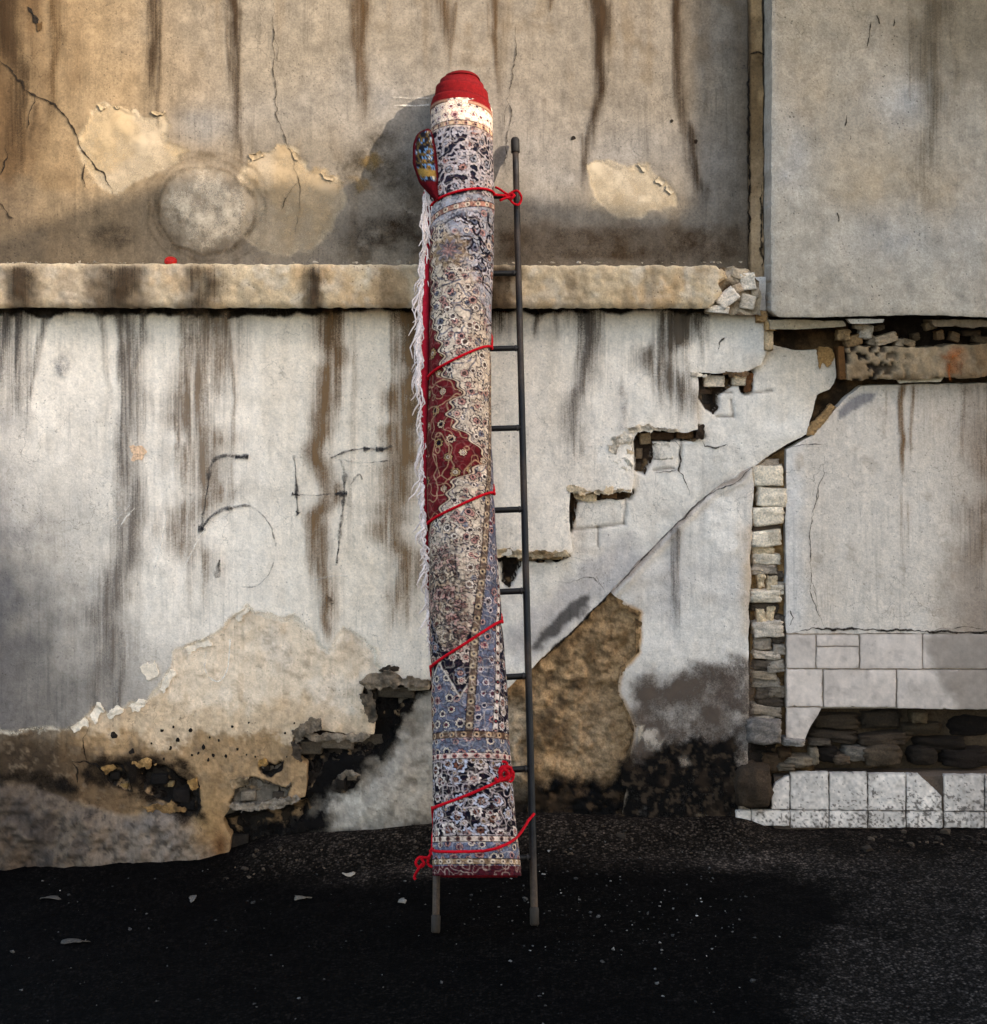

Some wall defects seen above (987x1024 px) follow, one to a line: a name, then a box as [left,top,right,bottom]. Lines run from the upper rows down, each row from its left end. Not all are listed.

crack [0,61,113,194]
crack [272,3,301,233]
water stain [582,0,608,165]
water stain [672,0,703,190]
water stain [0,266,423,707]
spalling [608,423,705,474]
crack [538,441,987,663]
spalling [801,379,870,438]
spalling [773,315,987,368]
spalling [191,649,431,848]
spalling [508,593,642,813]
water stain [631,655,754,767]